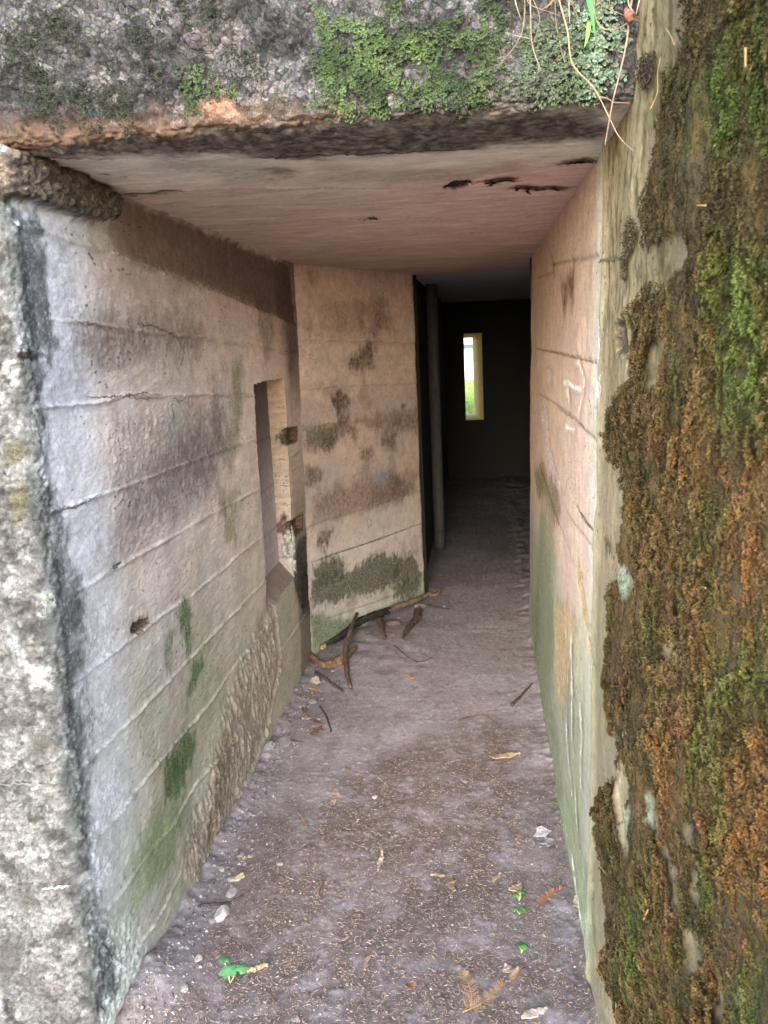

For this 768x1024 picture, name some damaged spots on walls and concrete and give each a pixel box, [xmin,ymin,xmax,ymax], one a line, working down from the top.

spalling [443,180,471,189]
crack [83,391,183,429]
corrosion [277,513,287,535]
spalling [130,617,149,635]